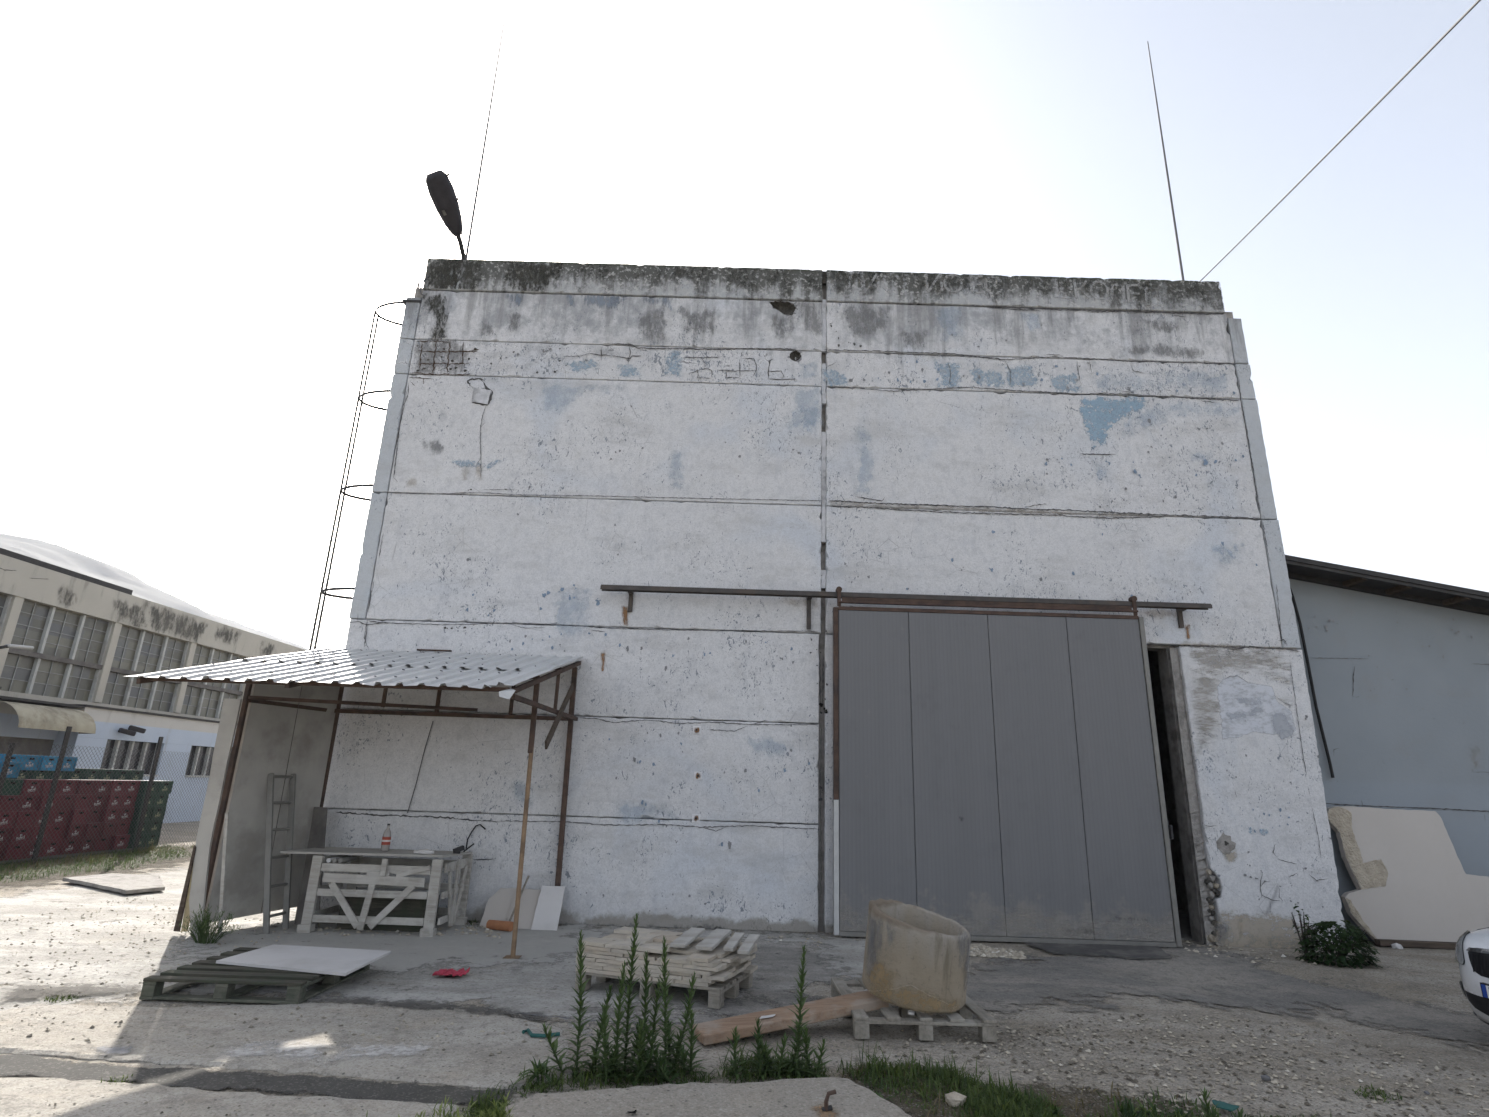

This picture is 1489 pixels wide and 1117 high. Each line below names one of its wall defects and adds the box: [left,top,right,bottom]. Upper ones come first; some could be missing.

water stain [416,259,481,373]
water stain [504,261,624,326]
water stain [639,268,713,338]
water stain [728,268,1225,357]
peeling [1217,676,1308,739]